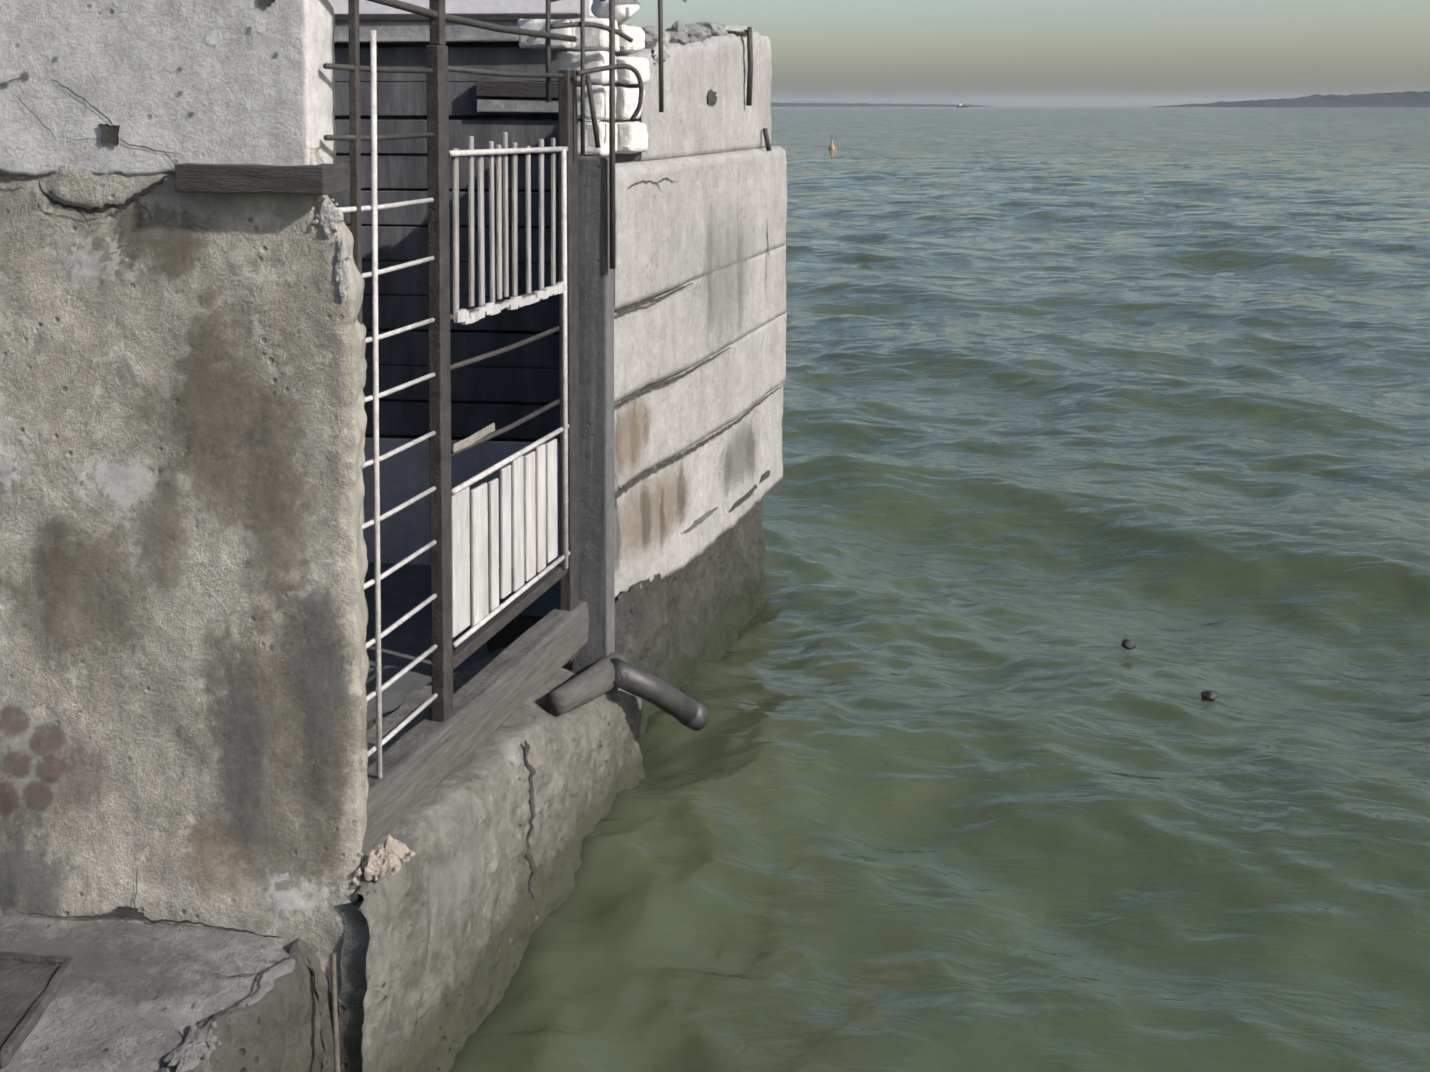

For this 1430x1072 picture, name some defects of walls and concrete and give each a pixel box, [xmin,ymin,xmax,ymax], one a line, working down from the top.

crack [0,77,179,228]
leakage [287,590,347,776]
spalling [164,1022,221,1072]